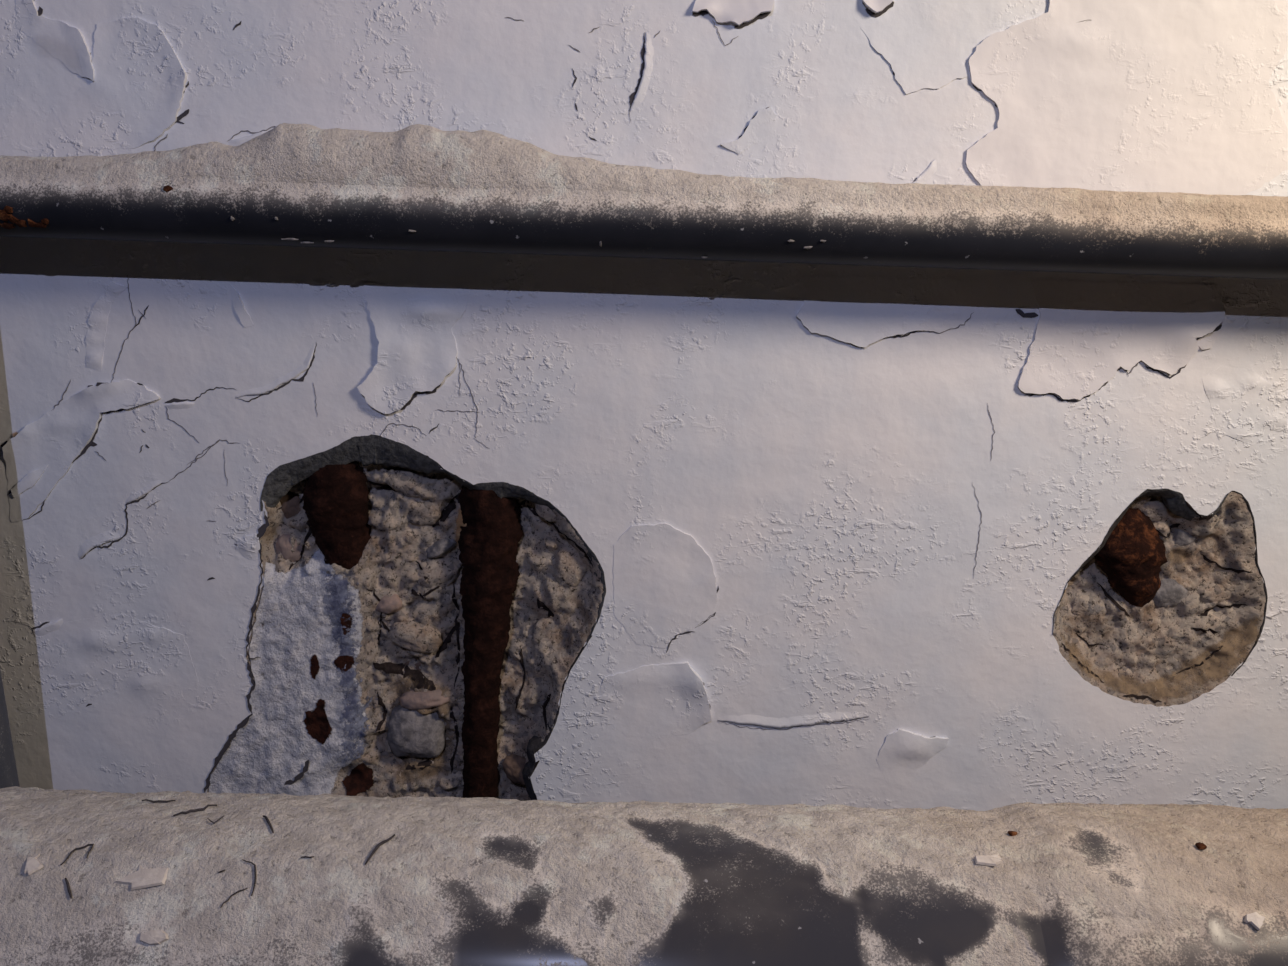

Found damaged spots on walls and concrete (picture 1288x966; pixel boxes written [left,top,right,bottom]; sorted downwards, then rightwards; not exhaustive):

crack [569,27,599,141]
crack [629,31,660,121]
peeling [965,0,1288,195]
crack [8,276,318,559]
rust [303,699,332,744]
rust [310,654,355,679]
spalling [207,434,606,801]
spalling [1052,489,1268,707]
rust [342,763,374,796]